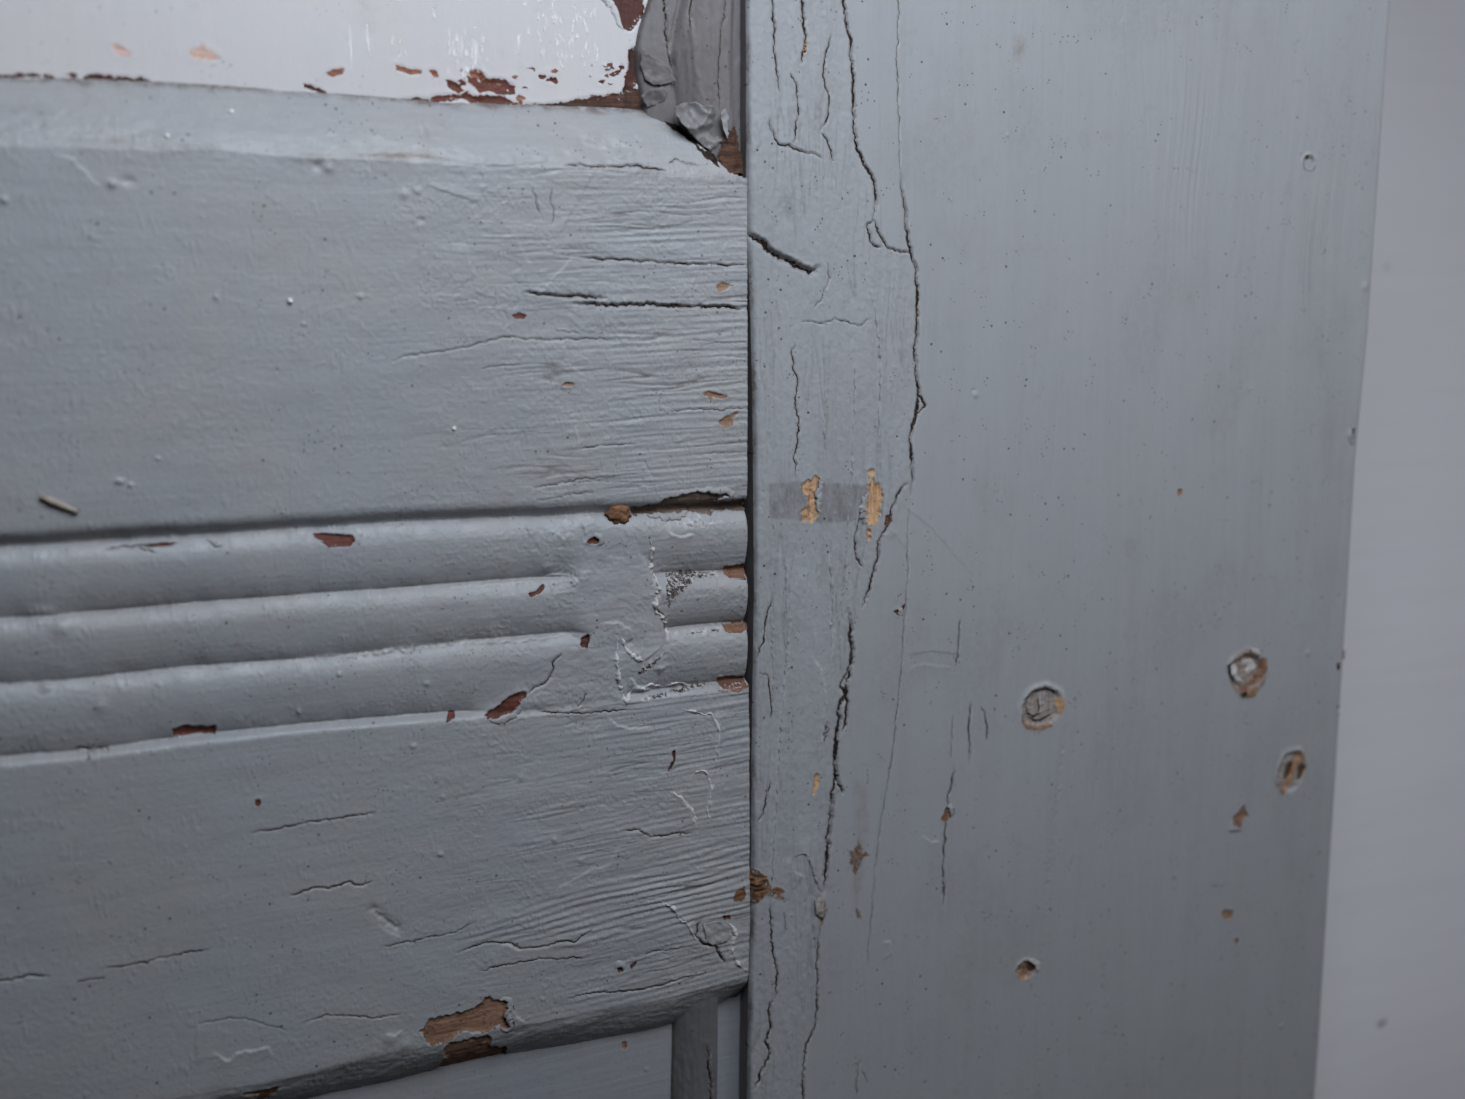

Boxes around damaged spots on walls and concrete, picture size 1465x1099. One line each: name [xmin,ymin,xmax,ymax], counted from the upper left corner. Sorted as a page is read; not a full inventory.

peeling [396,0,743,175]
crack [394,292,743,369]
crack [587,233,868,471]
peeling [314,525,355,548]
peeling [800,475,824,524]
crack [769,0,926,951]
peeling [485,692,527,725]
peeling [716,675,749,693]
crack [757,604,772,713]
crack [382,922,725,999]
peeling [420,996,515,1068]
crack [755,910,819,1099]